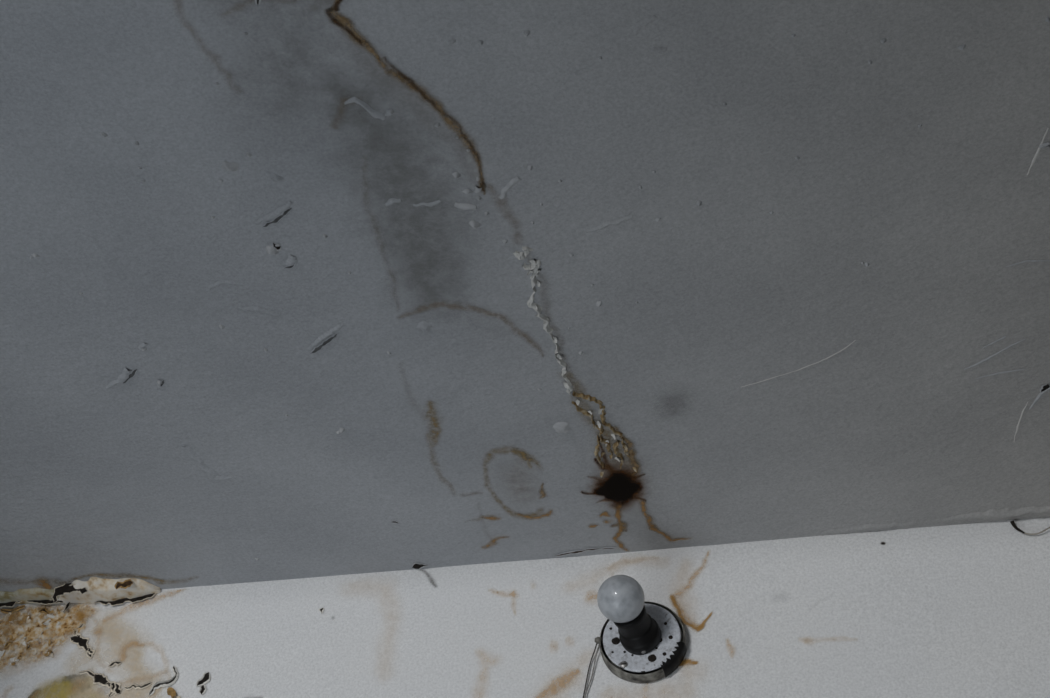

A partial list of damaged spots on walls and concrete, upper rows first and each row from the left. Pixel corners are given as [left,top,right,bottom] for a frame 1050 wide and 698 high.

corrosion [581,428,688,551]
spalling [0,577,161,671]
corrosion [670,573,712,631]